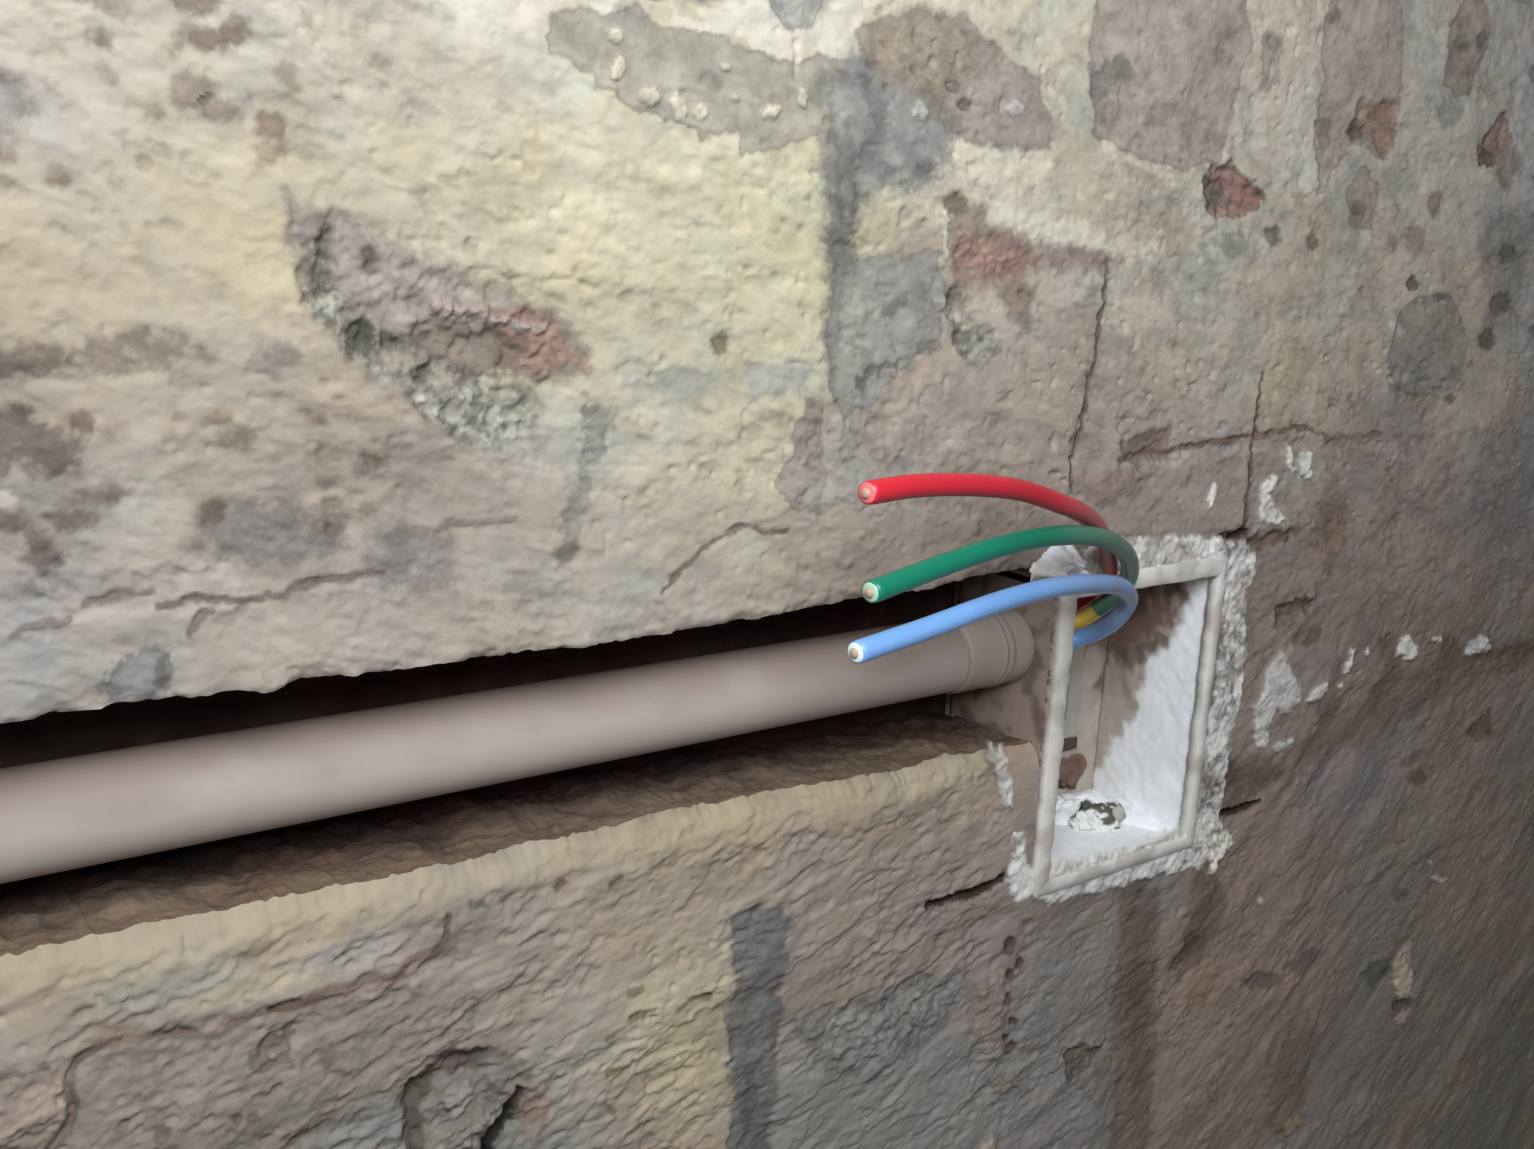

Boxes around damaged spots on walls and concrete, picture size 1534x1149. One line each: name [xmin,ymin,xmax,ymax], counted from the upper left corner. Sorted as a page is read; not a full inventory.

flaking render [546,0,1053,156]
flaking render [1088,0,1283,219]
flaking render [1314,0,1404,229]
water stain [818,53,950,388]
water stain [0,509,59,569]
water stain [0,407,119,476]
crack [12,570,383,636]
crack [412,515,517,534]
crack [1069,263,1108,491]
crack [1118,371,1424,540]
flaking render [51,981,550,1149]
water stain [724,906,792,1149]